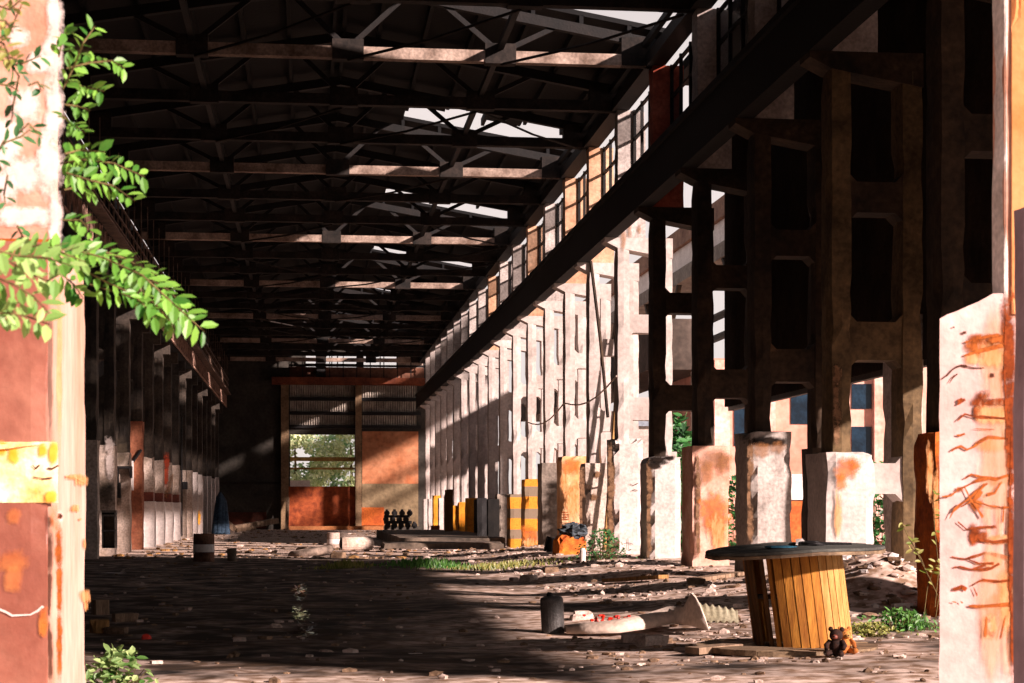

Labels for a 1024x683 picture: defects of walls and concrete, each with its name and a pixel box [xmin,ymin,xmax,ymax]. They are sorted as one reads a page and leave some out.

peeling [0,0,63,239]
rust [834,459,860,536]
rust [926,292,1016,673]